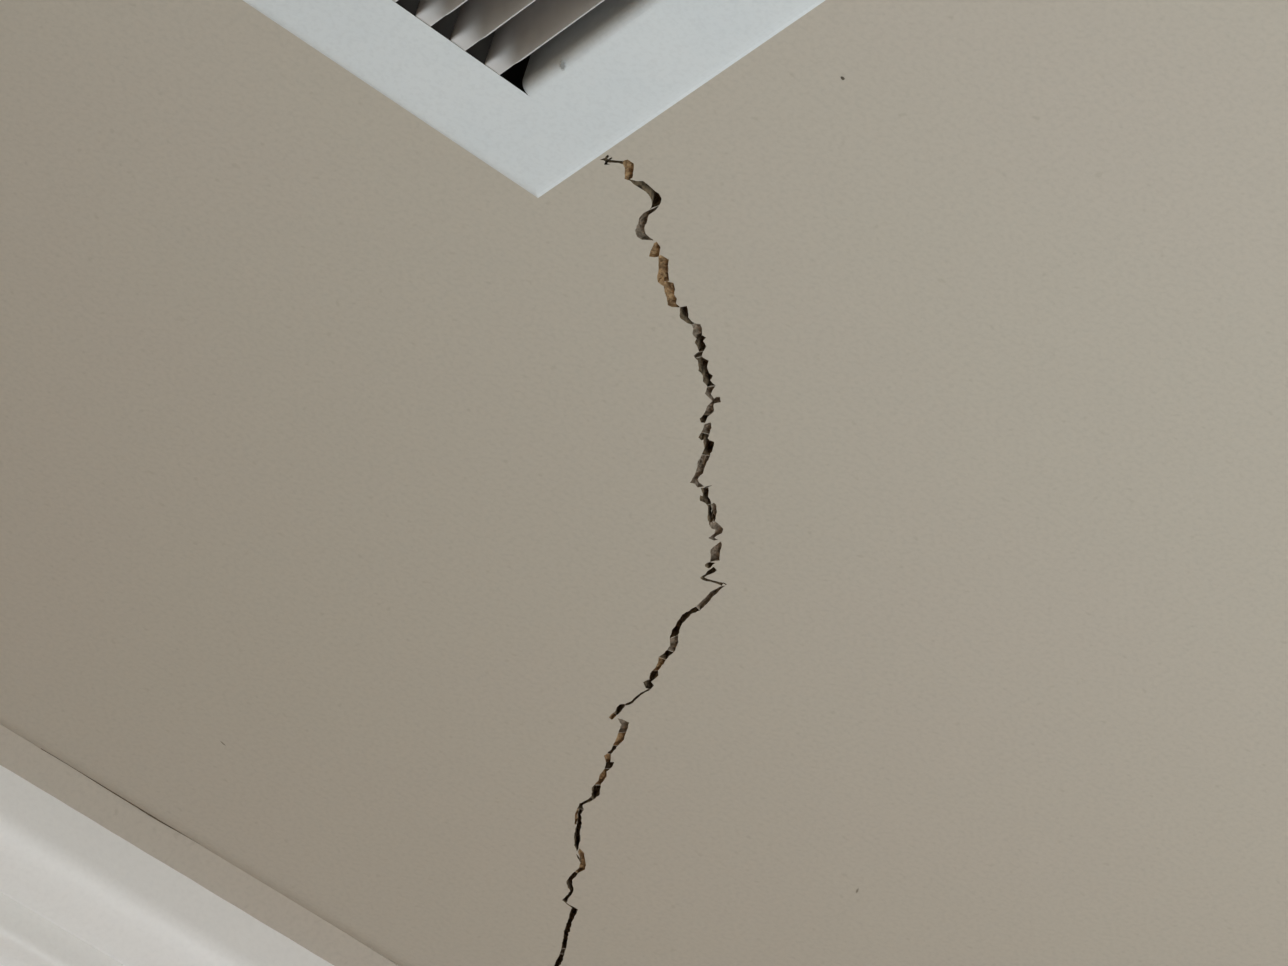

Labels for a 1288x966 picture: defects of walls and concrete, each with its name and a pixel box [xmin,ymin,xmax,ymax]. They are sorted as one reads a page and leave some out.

crack [554,155,727,966]